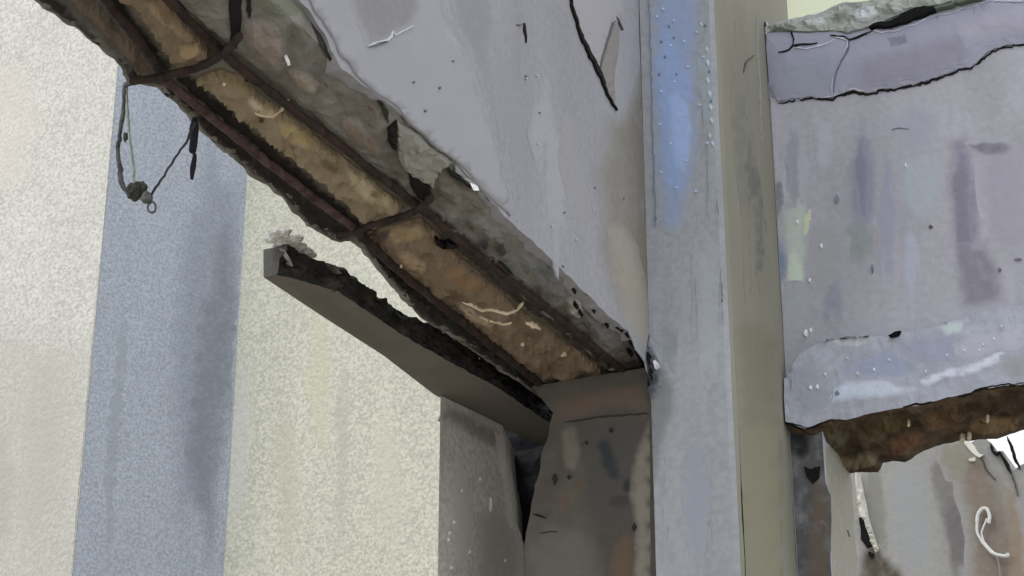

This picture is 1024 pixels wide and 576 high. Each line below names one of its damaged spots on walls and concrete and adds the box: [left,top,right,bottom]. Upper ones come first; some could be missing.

crack [569,0,624,111]
crack [743,0,1024,144]
spalling [118,0,663,400]
rust [375,179,651,423]
leakage [730,0,1024,421]
spalling [960,414,1020,462]